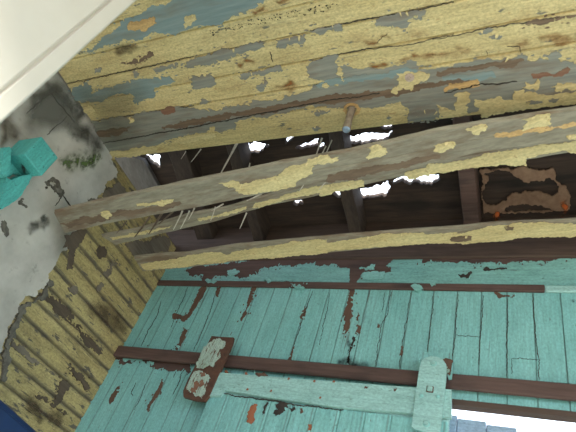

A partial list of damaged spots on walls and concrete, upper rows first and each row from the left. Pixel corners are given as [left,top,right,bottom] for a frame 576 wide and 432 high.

peeling [83,0,343,54]
peeling [372,7,429,33]
peeling [522,14,576,29]
damp [2,120,16,143]
damp [28,83,101,163]
peeling [68,34,576,160]
peeling [417,258,559,279]
spalling [0,279,103,382]
peeling [171,259,393,350]
peeling [341,289,361,365]
peeling [115,338,226,398]
peeling [245,401,303,424]